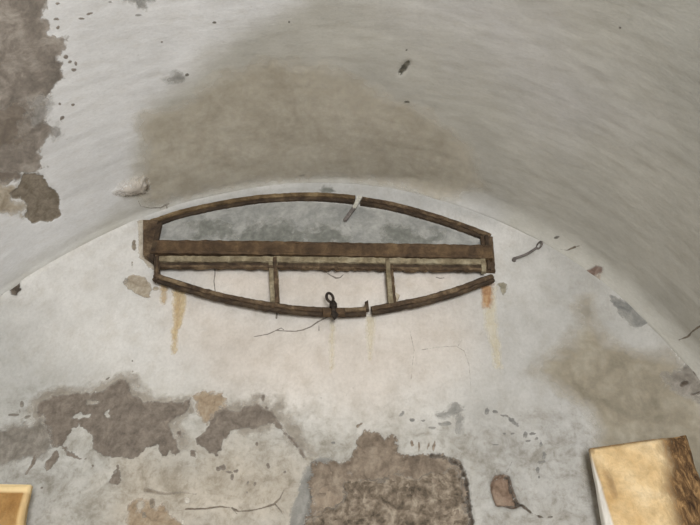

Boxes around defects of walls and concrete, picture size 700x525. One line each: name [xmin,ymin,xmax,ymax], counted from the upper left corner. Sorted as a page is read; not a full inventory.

peeling [0,0,77,223]
damp [140,61,481,202]
flaking render [123,275,159,298]
corrosion [161,285,186,353]
crack [254,313,328,337]
corrosion [481,285,499,364]
damp [541,298,700,477]
flaking render [29,371,475,525]
crack [144,488,283,512]